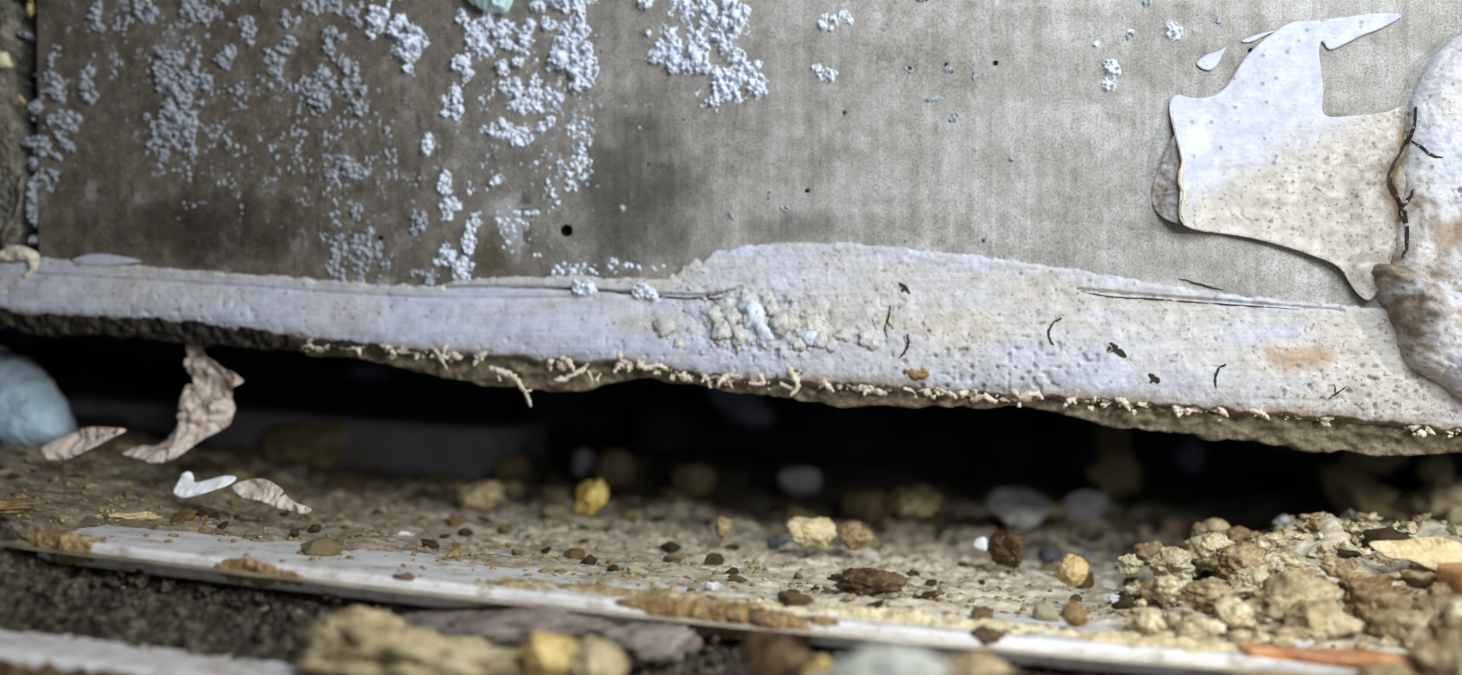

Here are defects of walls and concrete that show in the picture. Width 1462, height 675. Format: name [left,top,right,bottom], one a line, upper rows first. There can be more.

efflorescence [637,0,769,112]
peeling [1197,31,1274,70]
efflorescence [1,0,676,303]
crack [1387,107,1443,258]